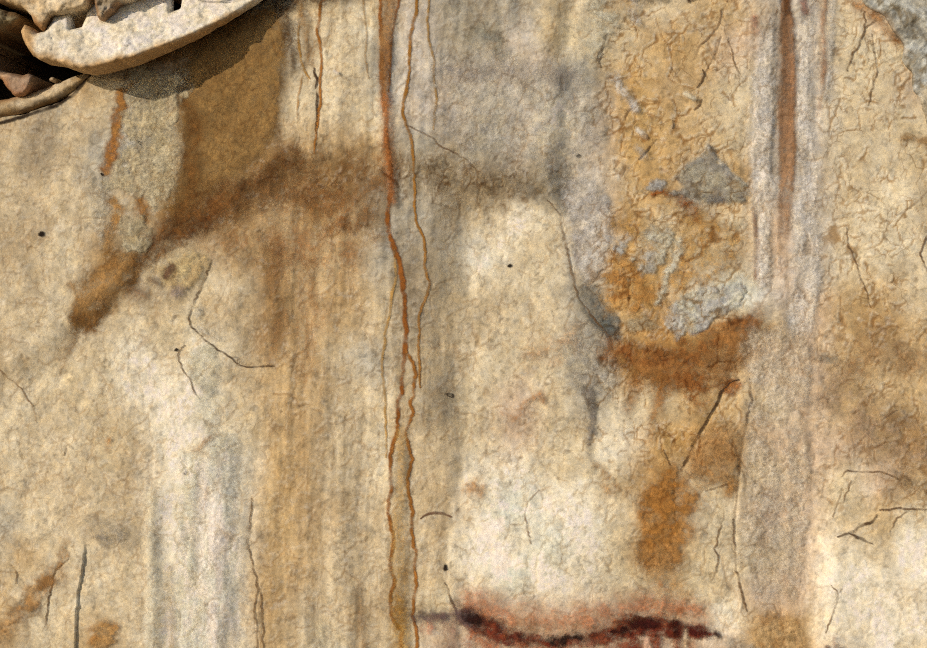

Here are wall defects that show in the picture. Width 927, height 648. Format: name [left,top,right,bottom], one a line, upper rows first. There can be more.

crack [694,1,735,110]
crack [849,11,878,104]
damp [93,3,312,237]
damp [119,215,152,252]
crack [177,259,271,396]
corrosion [70,0,438,648]
corrosion [601,190,741,313]
corrosion [598,314,763,419]
crack [846,231,870,305]
corrosion [637,427,741,589]
crack [832,470,920,544]
crack [247,498,265,648]